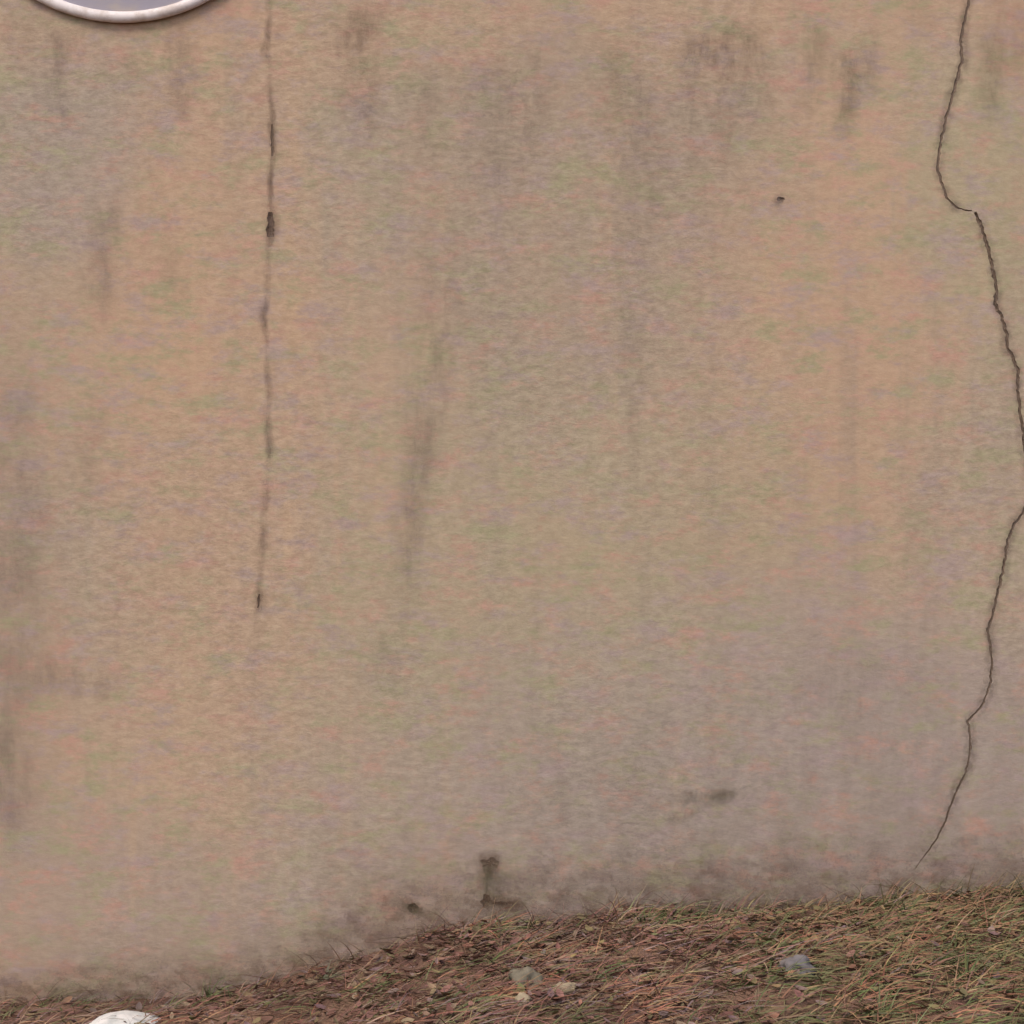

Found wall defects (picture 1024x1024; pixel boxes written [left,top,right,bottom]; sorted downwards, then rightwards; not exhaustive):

crack [266,212,275,237]
crack [268,124,276,156]
crack [936,0,1024,451]
crack [914,507,1024,870]